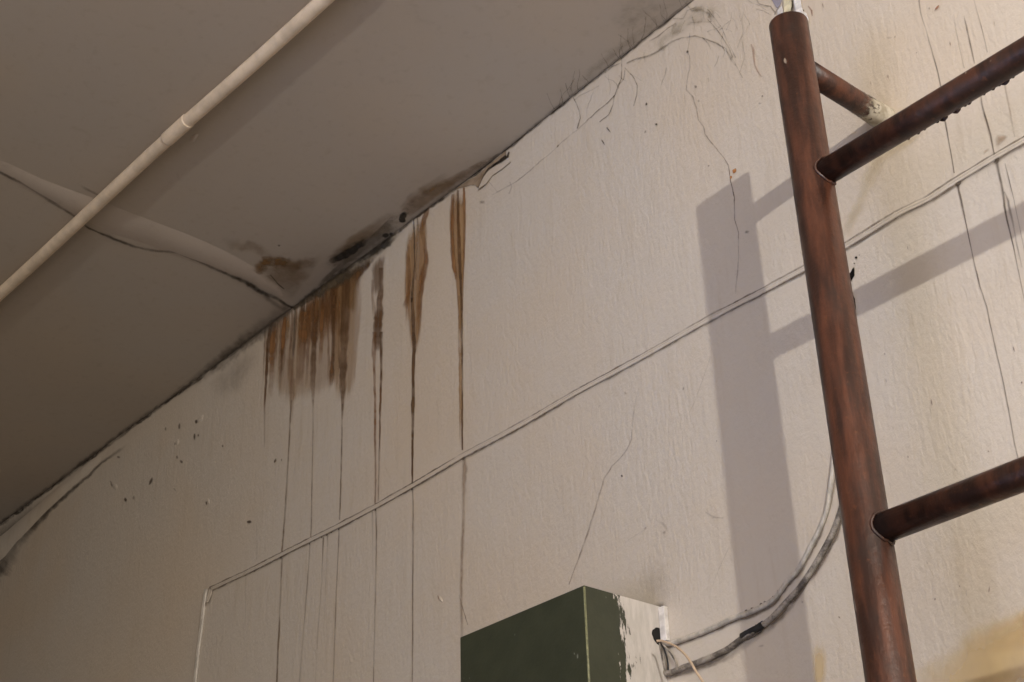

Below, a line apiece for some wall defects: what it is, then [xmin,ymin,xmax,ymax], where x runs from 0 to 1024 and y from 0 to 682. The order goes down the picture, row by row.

rust [257,258,289,272]
rust [264,261,383,446]
water stain [293,230,393,309]
crack [6,3,689,519]
rust [405,207,429,484]
rust [450,188,465,450]